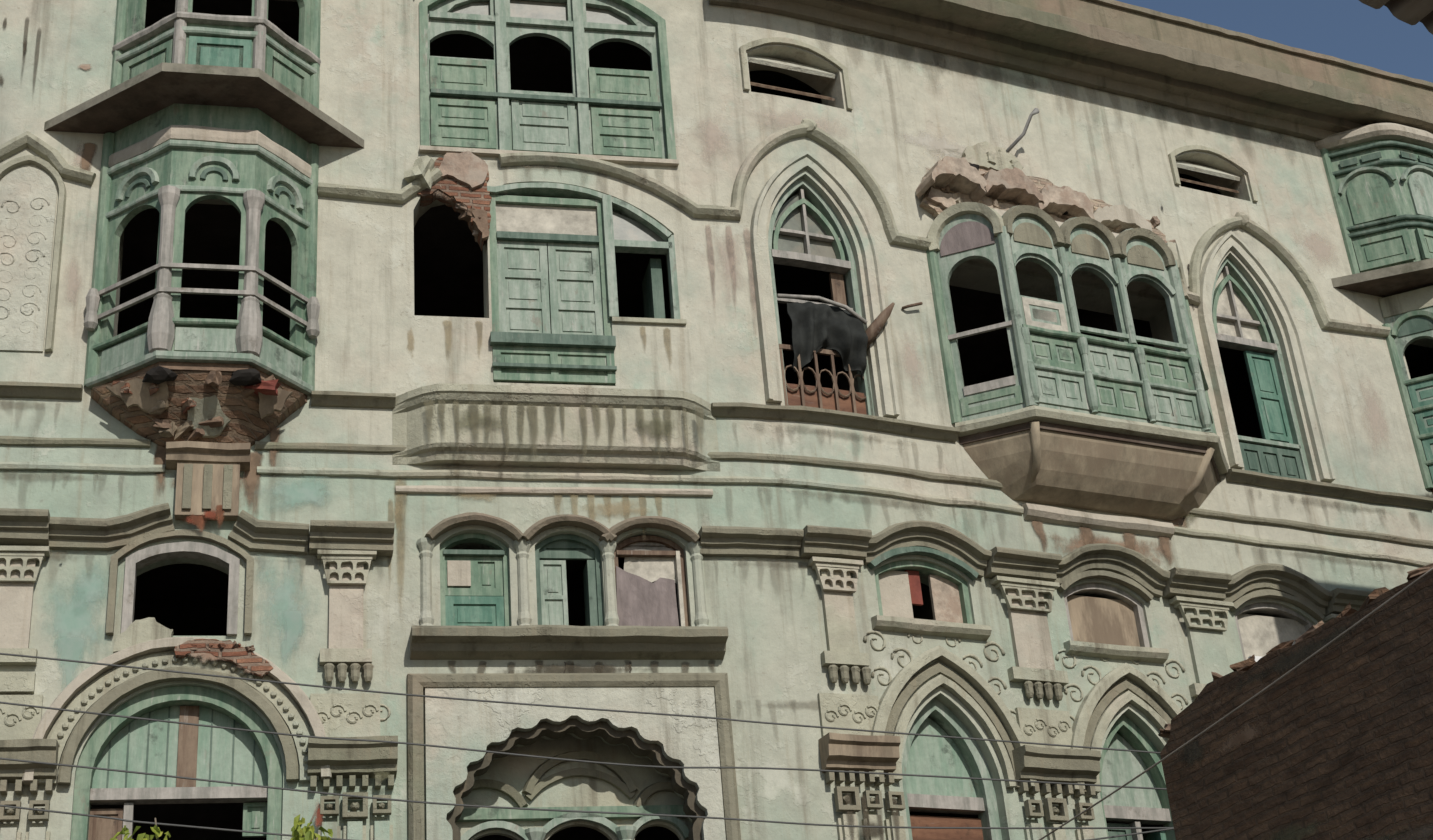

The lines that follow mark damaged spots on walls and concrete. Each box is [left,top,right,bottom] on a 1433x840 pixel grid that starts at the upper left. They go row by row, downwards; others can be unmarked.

peeling [404,155,481,242]
spalling [916,141,1177,244]
water stain [425,400,703,452]
spalling [174,639,273,678]